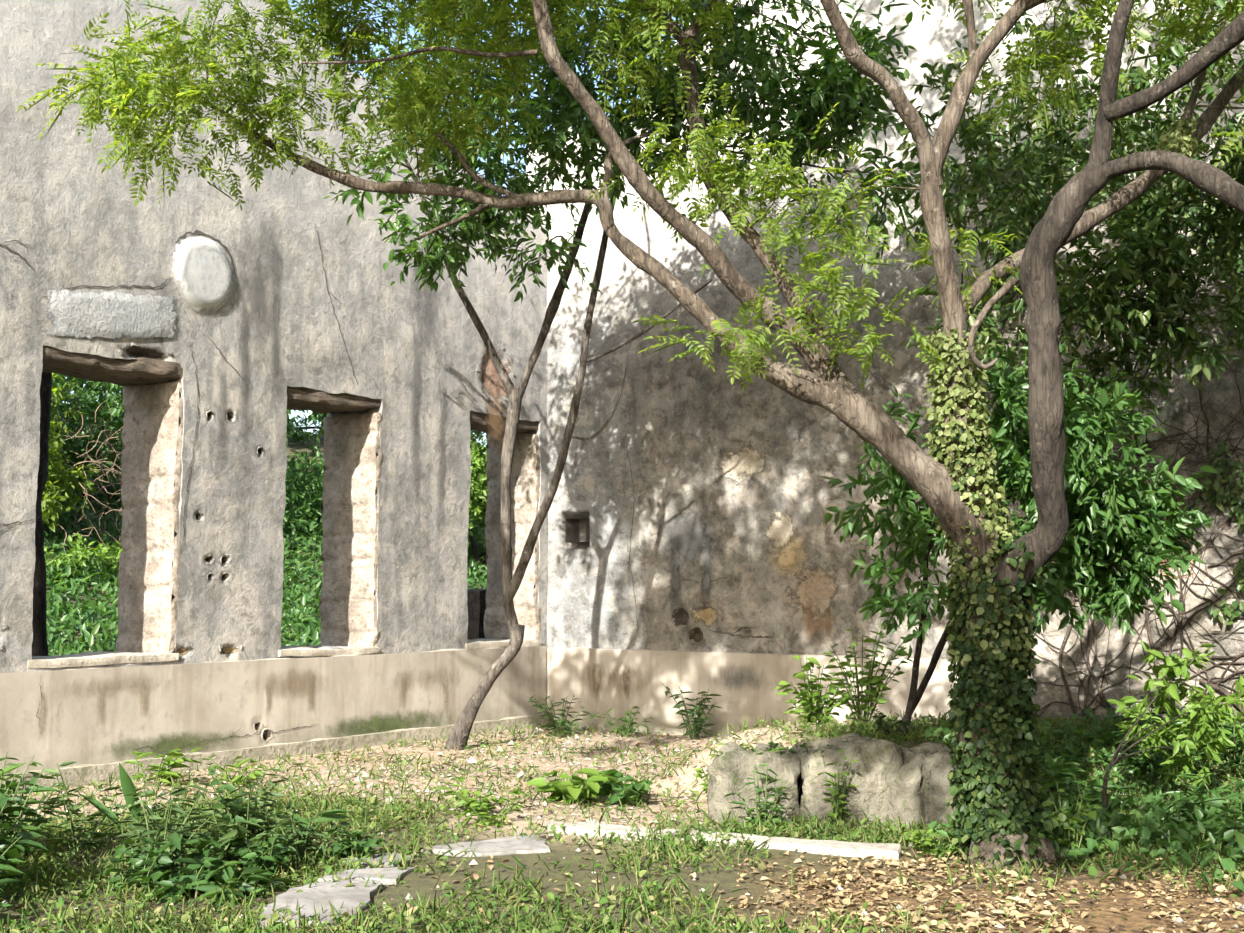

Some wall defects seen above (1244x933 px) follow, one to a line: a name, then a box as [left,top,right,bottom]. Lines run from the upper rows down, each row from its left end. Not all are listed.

crack [0,240,171,298]
crack [0,520,31,532]
spalling [762,509,843,621]